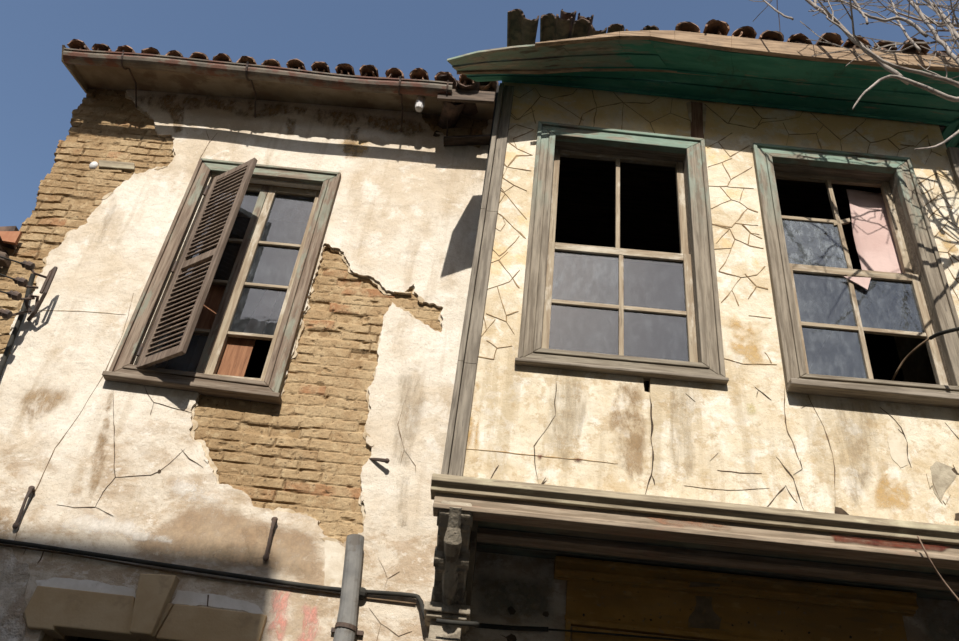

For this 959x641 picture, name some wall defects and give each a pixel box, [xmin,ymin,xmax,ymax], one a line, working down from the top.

flaking render [0,88,175,355]
crack [15,293,202,564]
flaking render [190,245,443,543]
crack [472,374,618,484]
crack [645,399,655,494]
crack [684,387,835,510]
crack [880,407,912,468]
spalling [926,461,959,504]